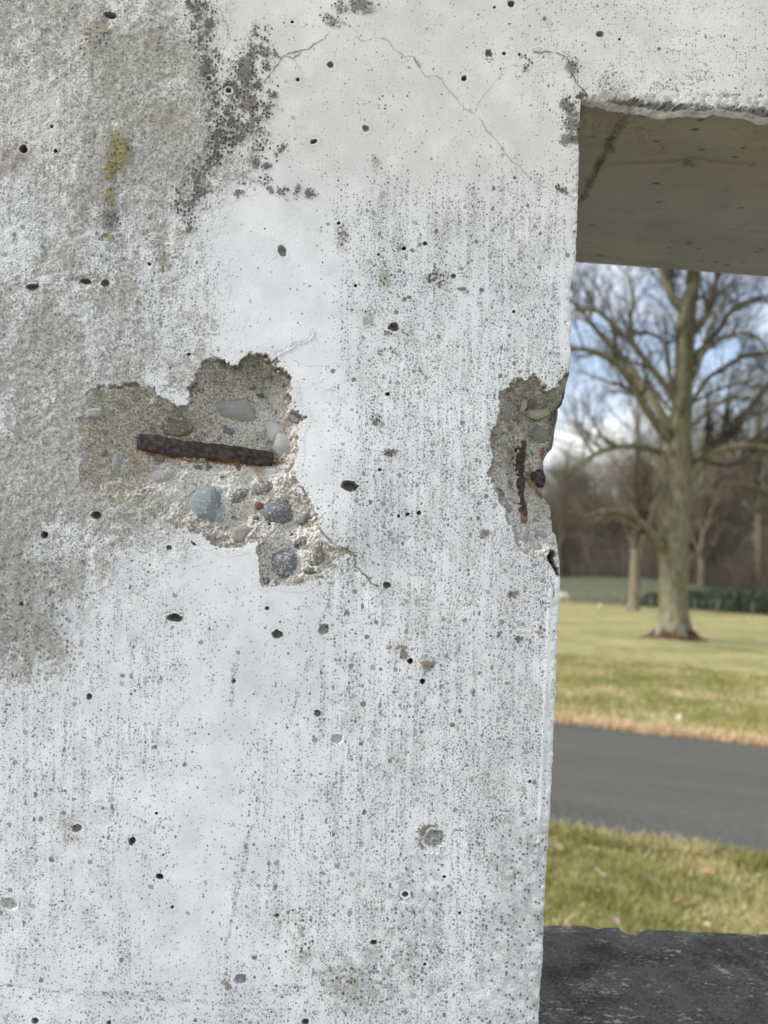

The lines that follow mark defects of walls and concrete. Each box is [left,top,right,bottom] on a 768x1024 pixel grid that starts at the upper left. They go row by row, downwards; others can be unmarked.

crack [262,32,330,83]
leakage [0,0,319,712]
corrosion [134,437,284,482]
spalling [70,328,361,593]
spalling [483,366,570,584]
corrosion [520,439,544,525]